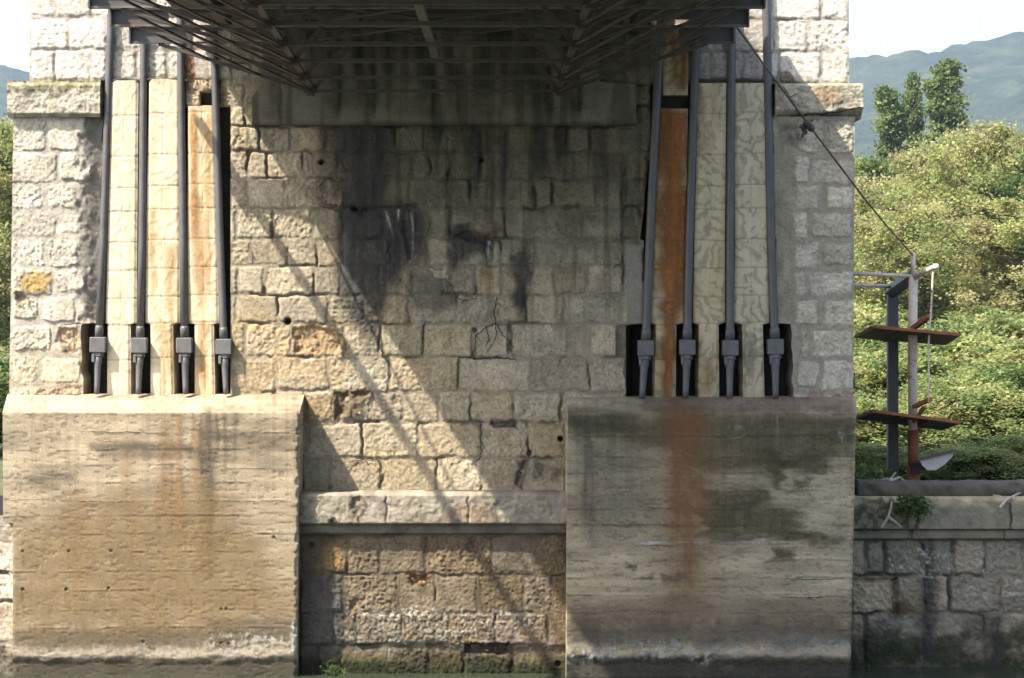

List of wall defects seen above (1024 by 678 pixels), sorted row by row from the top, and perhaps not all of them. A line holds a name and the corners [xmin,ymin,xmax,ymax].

damp [338,126,423,334]
damp [448,224,493,269]
corrosion [658,110,688,397]
crack [446,279,515,388]
spalling [305,390,372,422]